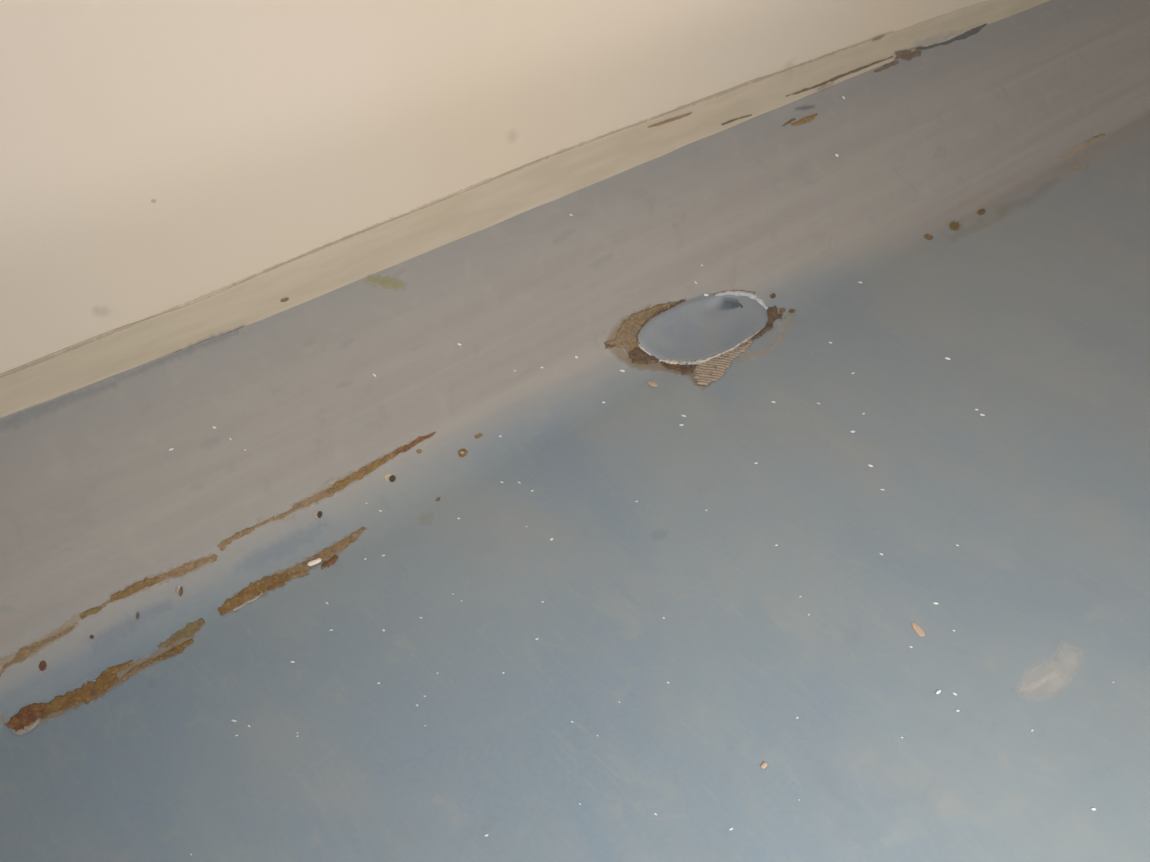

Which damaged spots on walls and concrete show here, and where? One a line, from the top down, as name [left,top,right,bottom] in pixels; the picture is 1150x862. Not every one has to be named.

peeling [605,290,795,389]
peeling [0,432,436,677]
peeling [0,618,204,732]